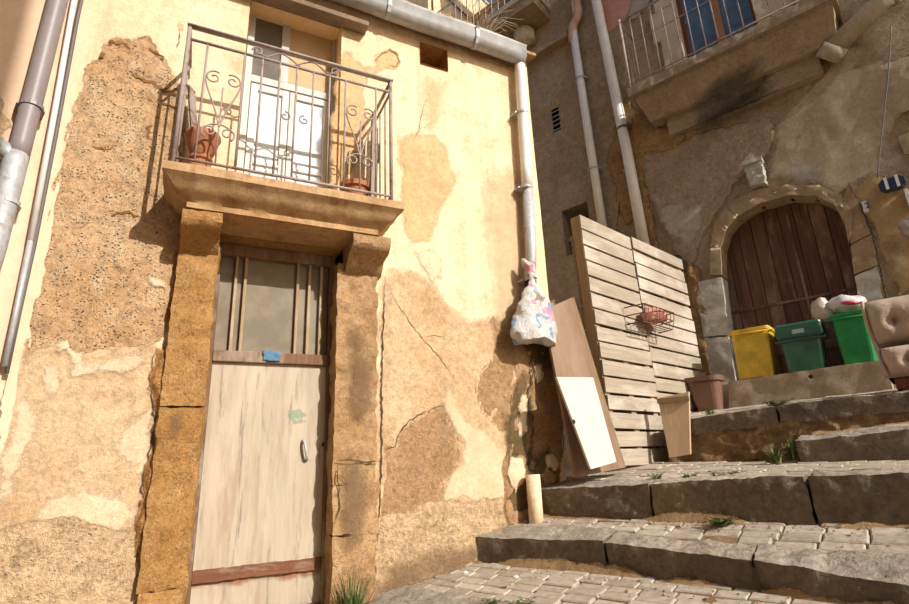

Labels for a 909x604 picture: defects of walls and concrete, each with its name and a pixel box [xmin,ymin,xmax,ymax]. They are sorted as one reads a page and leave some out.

peeling [0,99,12,136]
peeling [23,35,187,417]
peeling [606,95,776,376]
spalling [134,437,156,572]
crack [335,276,455,543]
peeling [379,405,460,516]
spalling [475,316,565,526]